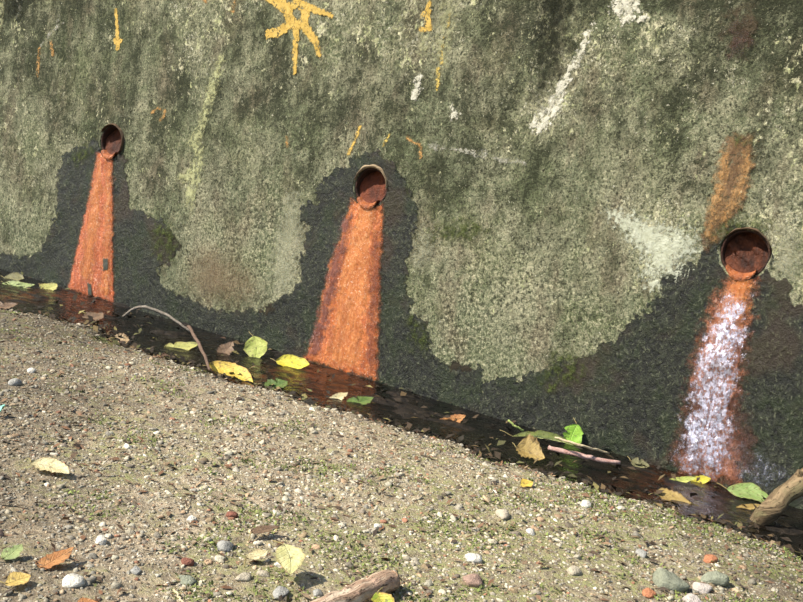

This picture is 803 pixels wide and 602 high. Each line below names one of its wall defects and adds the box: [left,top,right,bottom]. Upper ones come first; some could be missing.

rust [68,153,114,302]
rust [304,201,382,379]
water stain [0,138,803,496]
rust [667,276,759,484]
rust [701,133,755,250]